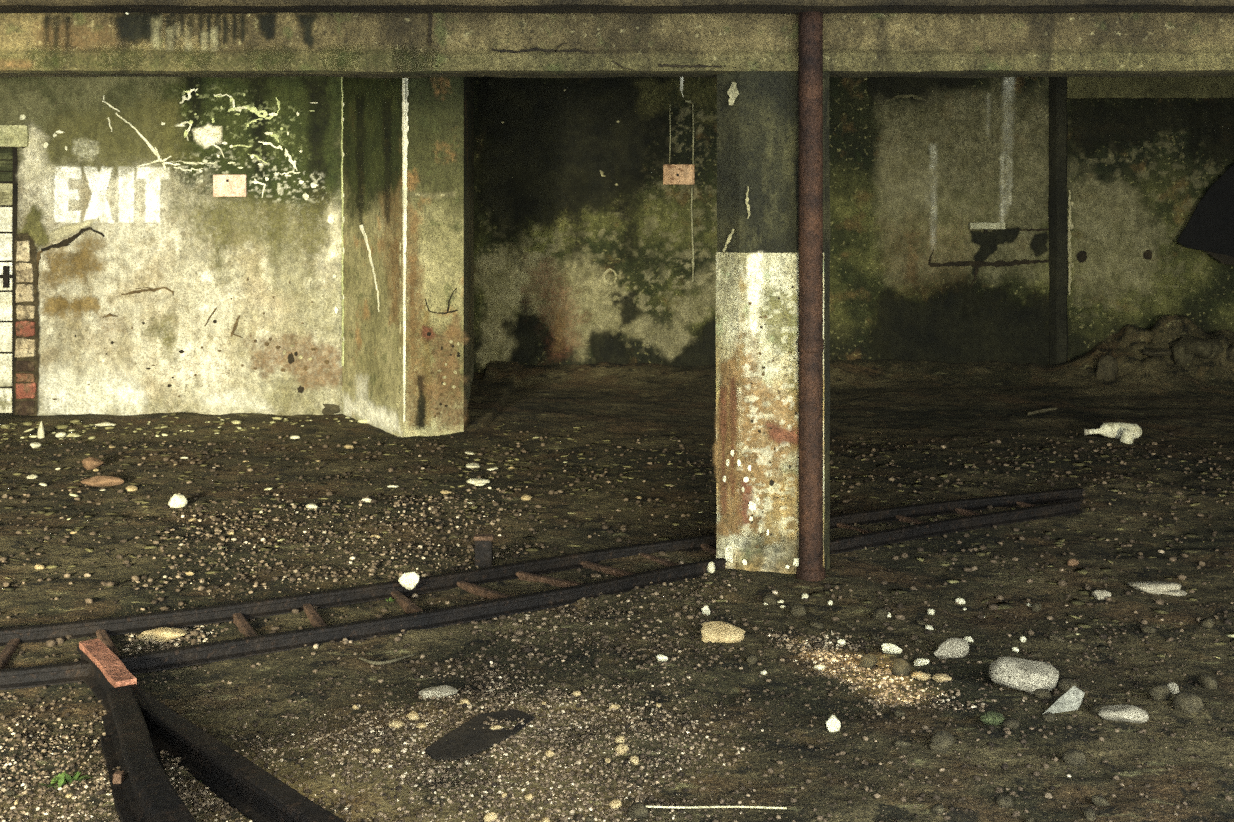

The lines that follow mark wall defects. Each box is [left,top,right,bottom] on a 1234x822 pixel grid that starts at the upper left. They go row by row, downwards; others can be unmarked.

damp [116,13,275,50]
damp [297,14,316,47]
damp [49,76,406,271]
peeling [161,88,317,200]
damp [474,76,717,258]
crack [36,227,104,286]
spalling [241,77,344,393]
crack [103,287,174,318]
damp [503,298,550,364]
damp [589,293,640,364]
damp [666,318,716,366]
corrosion [714,352,799,536]